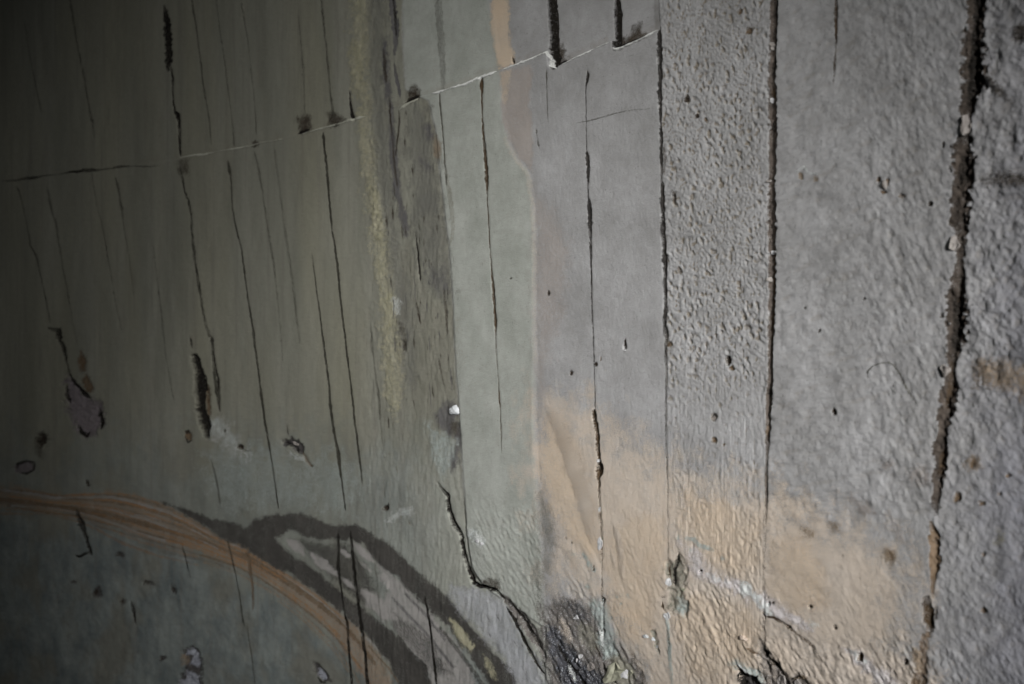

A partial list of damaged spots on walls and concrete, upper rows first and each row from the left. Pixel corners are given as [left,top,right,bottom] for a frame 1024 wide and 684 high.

crack [2,165,153,182]
crack [162,5,220,410]
crack [479,79,502,449]
crack [48,327,72,377]
spalling [61,350,106,441]
crack [438,483,505,599]
damp [587,597,619,660]
spalling [661,549,703,620]